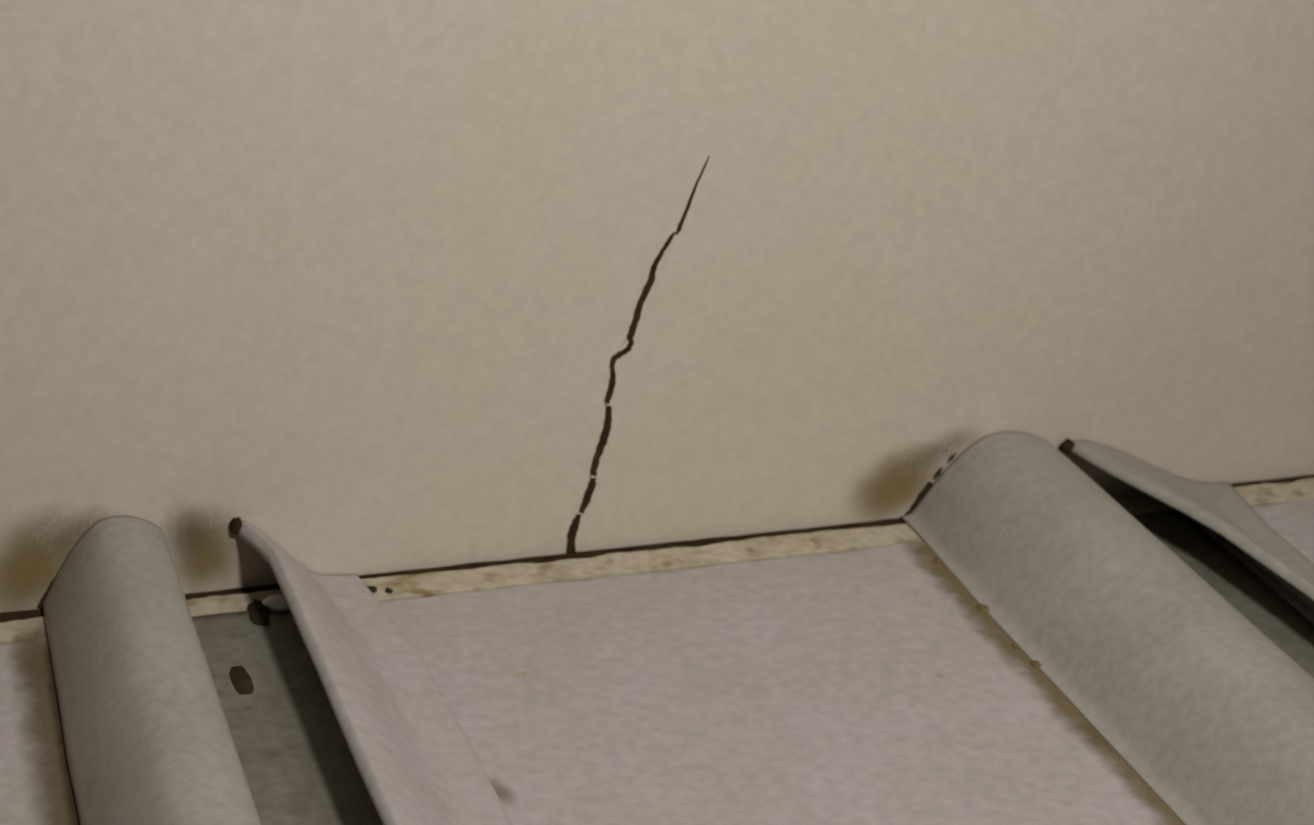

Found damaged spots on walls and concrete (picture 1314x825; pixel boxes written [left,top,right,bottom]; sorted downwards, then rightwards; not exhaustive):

crack [566,156,710,554]
spalling [1059,438,1075,453]
spalling [230,517,242,534]
peeling [248,594,289,626]
spalling [229,665,254,695]